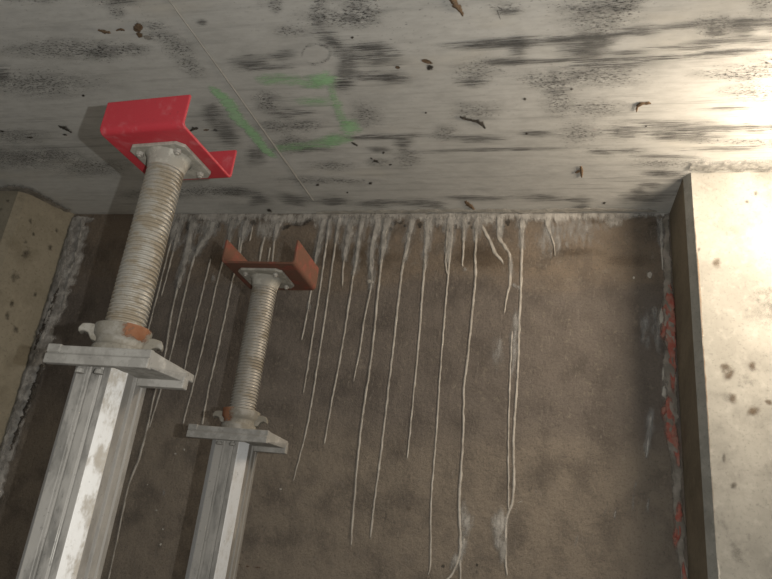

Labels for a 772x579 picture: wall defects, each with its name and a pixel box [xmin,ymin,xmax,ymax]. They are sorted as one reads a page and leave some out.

leakage [310,0,406,88]
leakage [438,0,772,152]
leakage [148,148,692,579]